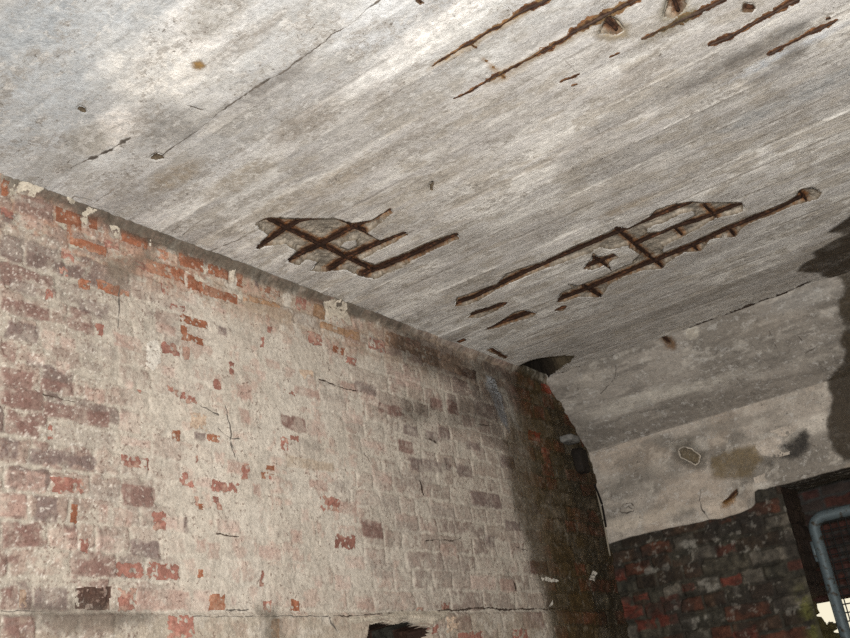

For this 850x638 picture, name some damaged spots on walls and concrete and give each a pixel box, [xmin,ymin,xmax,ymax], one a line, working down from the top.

spalling [599,16,623,35]
spalling [664,0,687,19]
spalling [742,3,756,13]
crack [163,0,380,155]
crack [71,137,131,168]
spalling [255,208,459,280]
spalling [455,188,822,318]
damp [799,217,850,459]
crack [201,406,240,462]
damp [784,431,808,457]